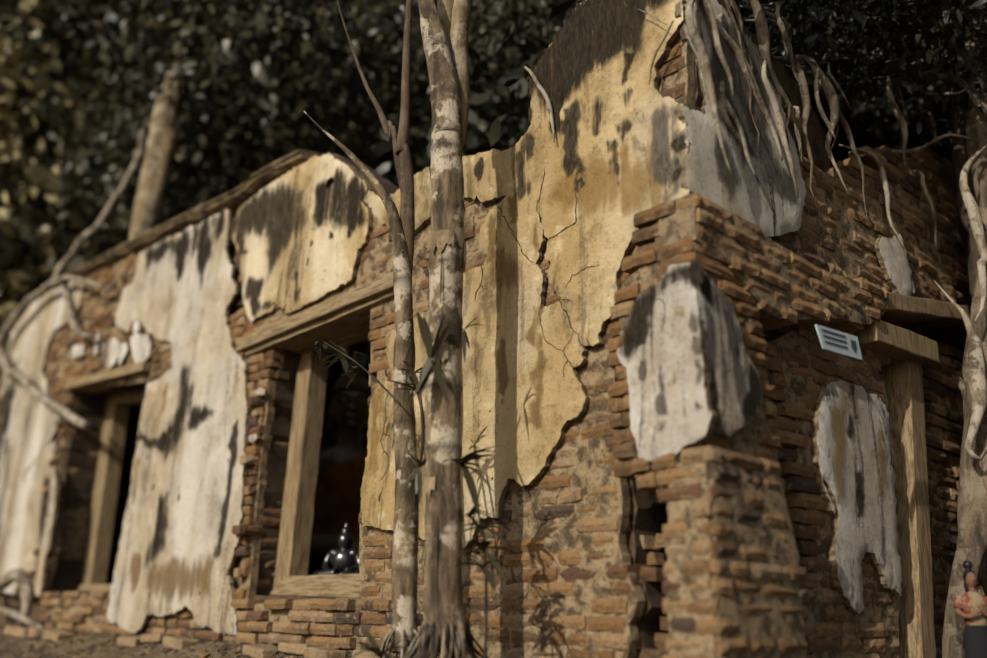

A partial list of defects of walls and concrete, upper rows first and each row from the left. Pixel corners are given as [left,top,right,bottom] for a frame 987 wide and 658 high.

damp [526,0,663,192]
damp [145,169,364,316]
spalling [463,198,503,273]
crack [497,192,577,266]
spalling [770,145,969,304]
crack [539,264,599,377]
damp [146,493,168,563]
damp [138,366,212,462]
spalling [36,208,412,653]
damp [213,421,238,558]
spalling [462,262,900,658]
spalling [922,339,964,658]